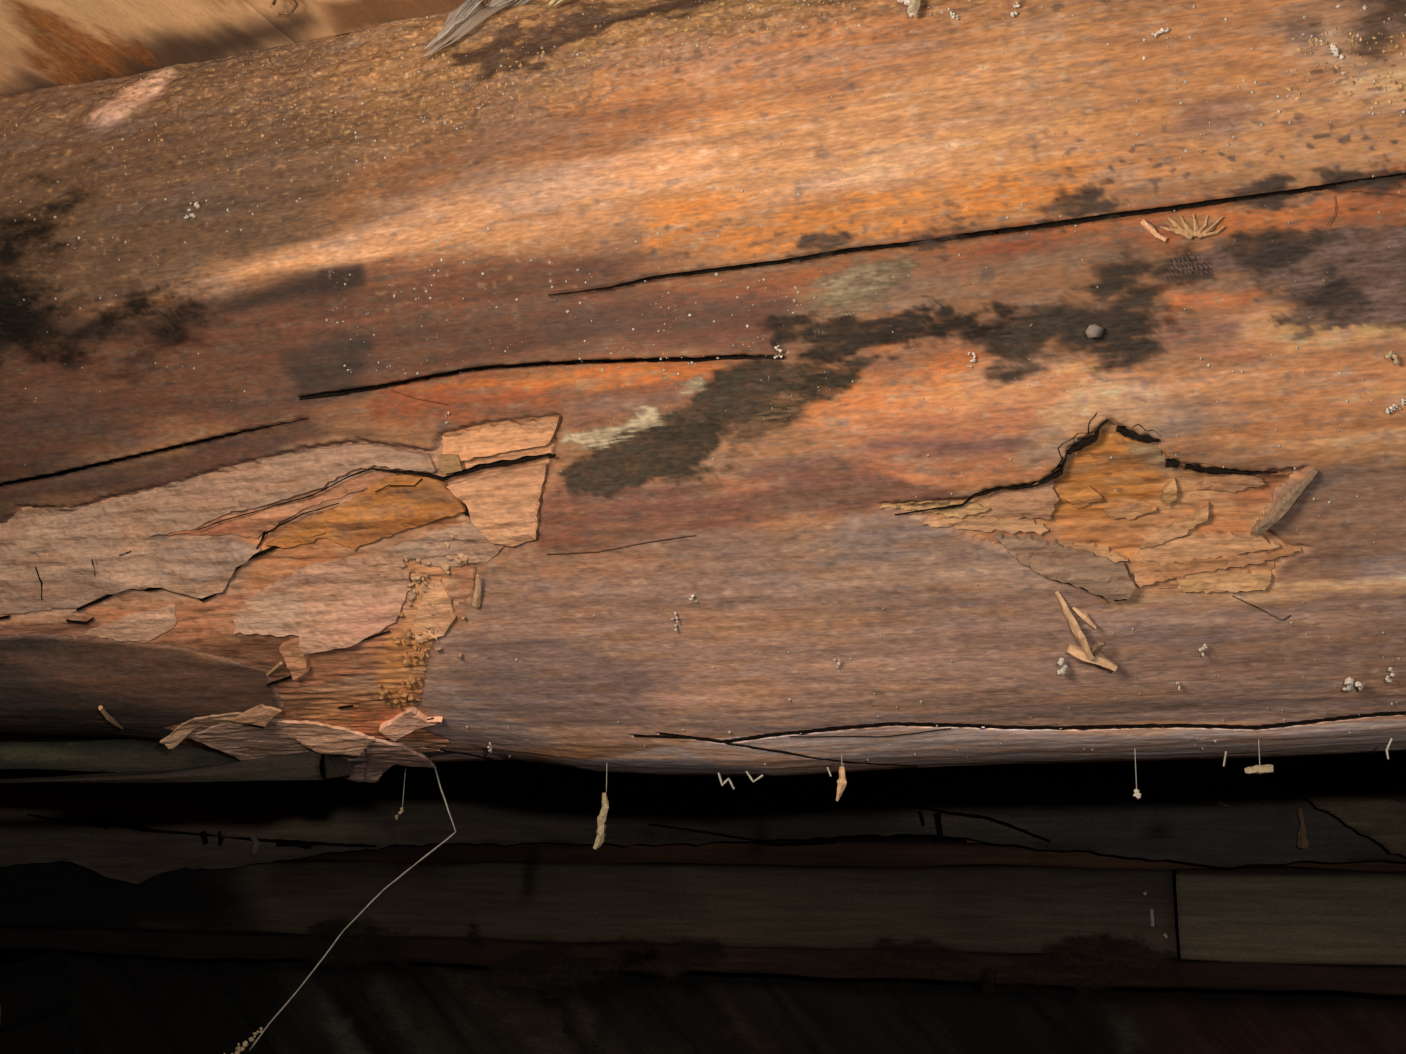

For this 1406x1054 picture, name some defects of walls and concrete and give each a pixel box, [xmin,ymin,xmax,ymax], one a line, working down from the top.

leakage [0,199,204,368]
crack [549,173,1406,296]
leakage [1244,175,1296,210]
leakage [1314,169,1405,195]
peeling [0,416,562,680]
crack [197,453,556,602]
crack [0,354,784,486]
leakage [559,225,1406,497]
crack [895,412,1278,515]
peeling [880,473,1301,602]
peeling [379,706,443,741]
crack [634,712,1406,767]